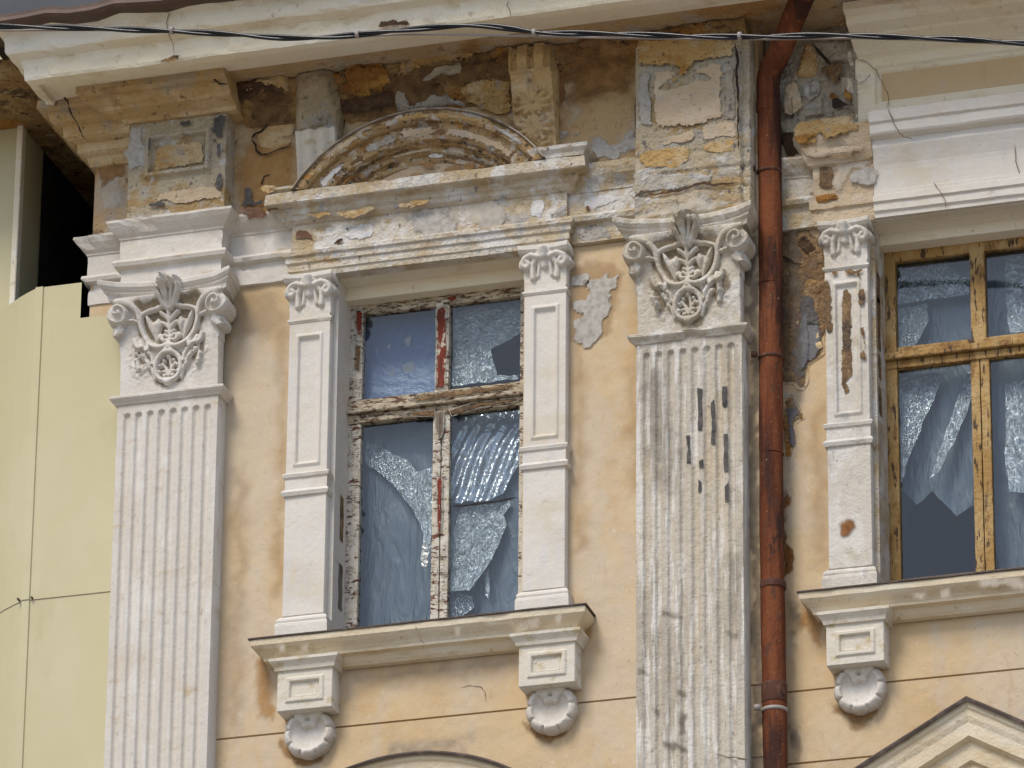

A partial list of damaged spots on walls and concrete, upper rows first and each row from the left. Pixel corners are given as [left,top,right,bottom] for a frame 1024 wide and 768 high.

flaking render [553,18,751,82]
crack [63,97,86,139]
flaking render [236,78,297,129]
flaking render [320,47,524,187]
flaking render [639,120,737,169]
flaking render [780,21,867,204]
crack [858,59,914,140]
peeling [307,206,375,244]
peeling [571,273,618,348]
spalling [782,230,882,460]
rust [784,494,794,576]
rust [840,519,855,536]